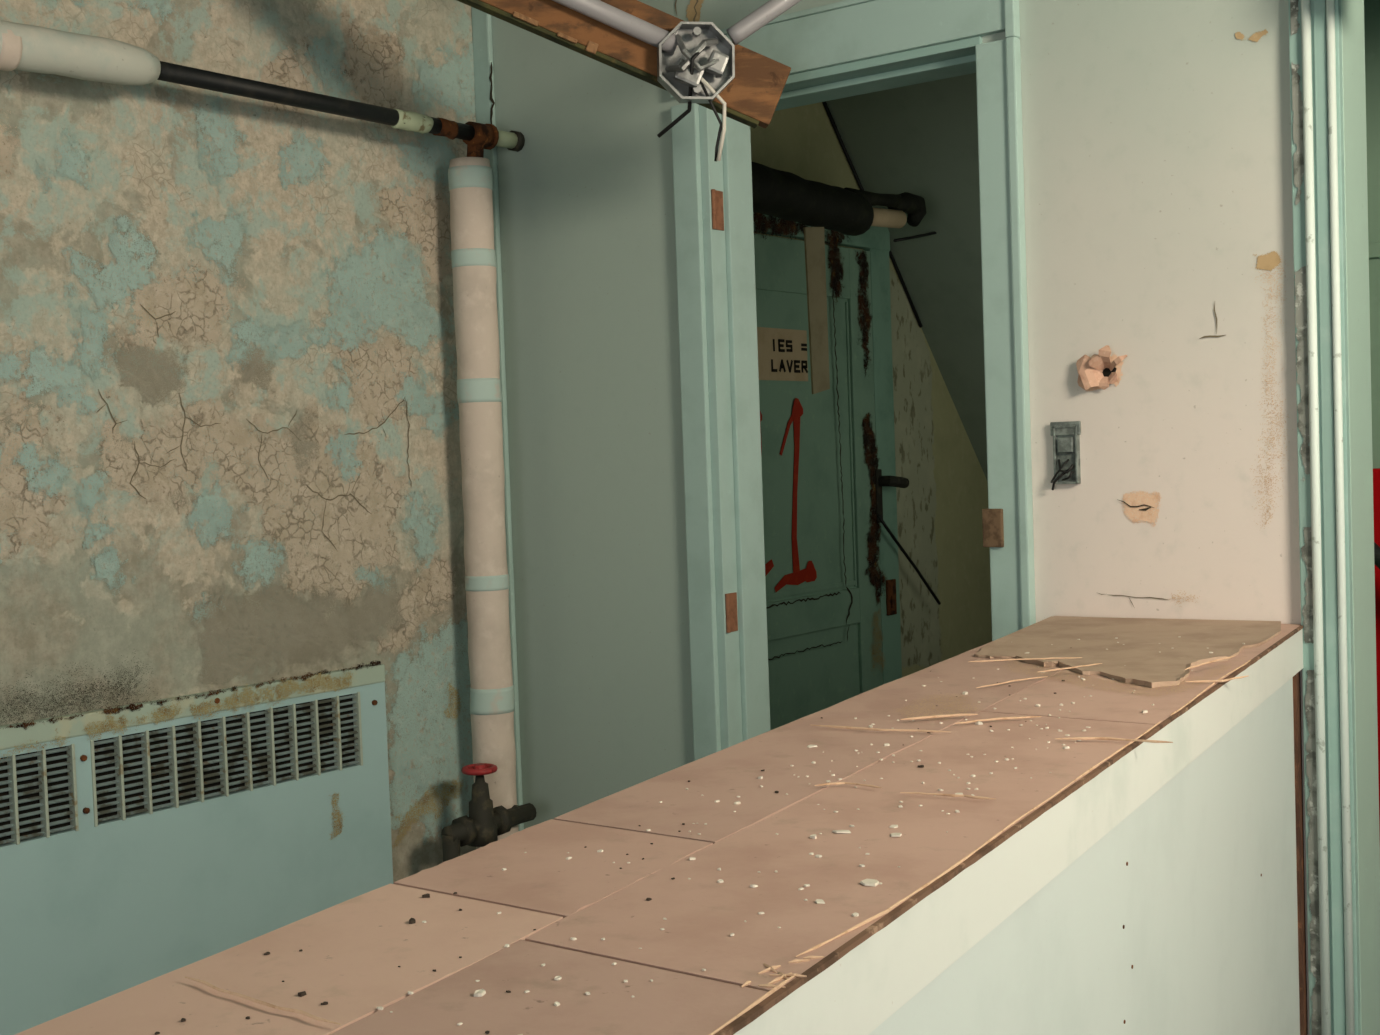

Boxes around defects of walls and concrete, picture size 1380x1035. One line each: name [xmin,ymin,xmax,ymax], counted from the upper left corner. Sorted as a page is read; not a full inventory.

peeling [258,11,458,303]
rust [753,212,852,304]
spalling [1076,345,1127,391]
crack [98,389,301,499]
crack [345,398,412,483]
crack [307,474,371,552]
spalling [1119,491,1161,527]
rust [0,661,381,761]